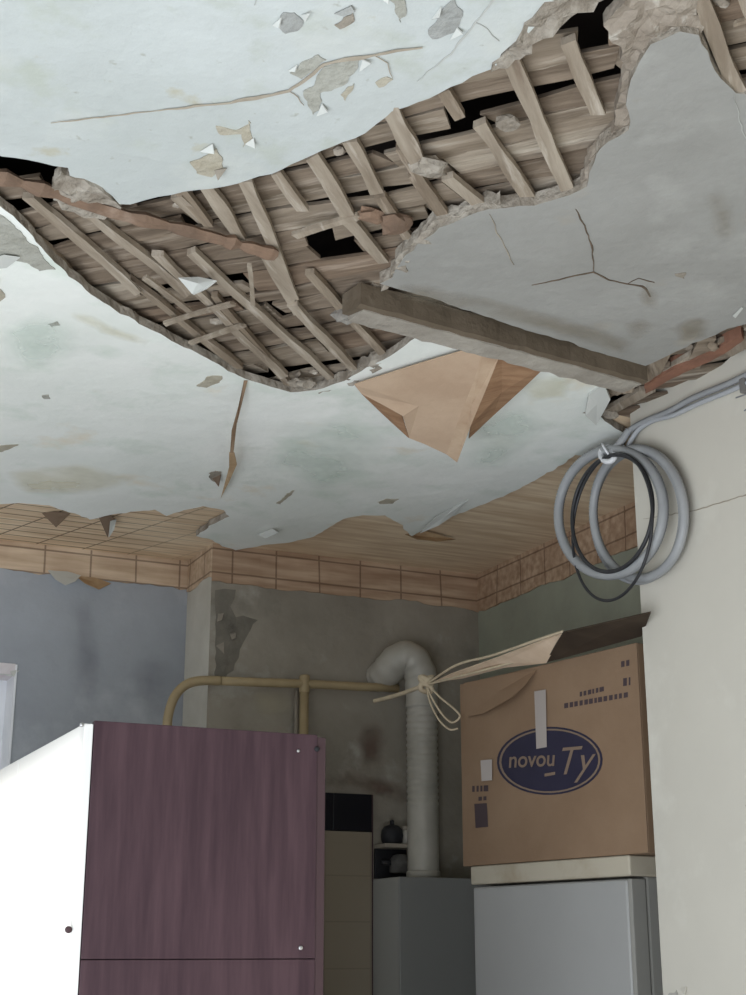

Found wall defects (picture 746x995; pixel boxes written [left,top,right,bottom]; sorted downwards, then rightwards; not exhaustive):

flaking render [272,12,310,34]
flaking render [428,0,463,40]
crack [52,0,499,123]
flaking render [289,54,371,116]
flaking render [190,144,227,180]
flaking render [0,215,55,271]
crack [533,210,655,297]
flaking render [179,277,217,295]
spalling [583,324,746,445]
peeling [0,503,225,561]
peeling [252,455,635,574]
flaking render [214,589,257,677]